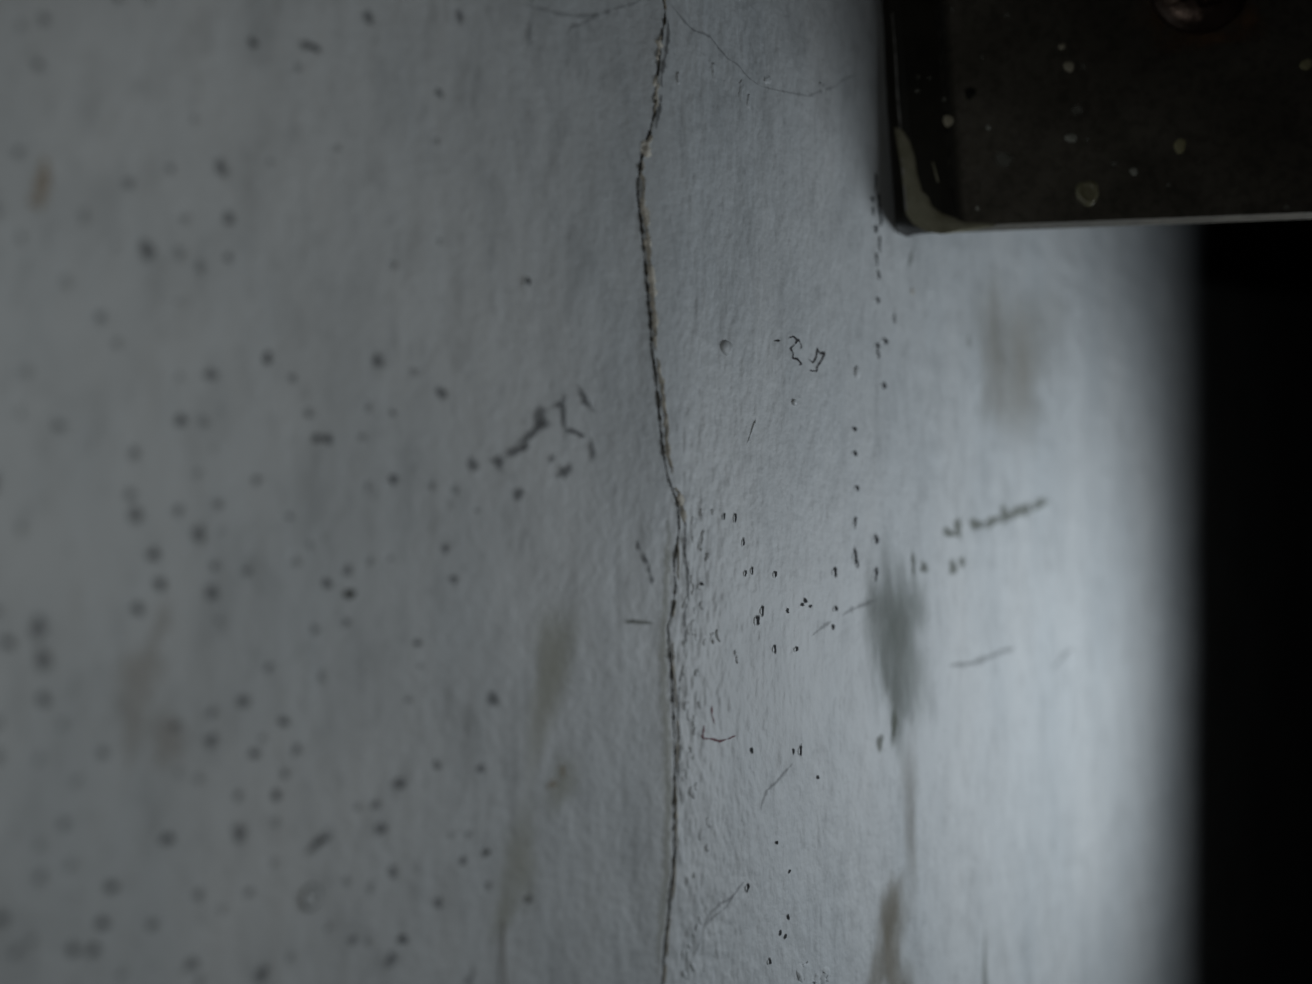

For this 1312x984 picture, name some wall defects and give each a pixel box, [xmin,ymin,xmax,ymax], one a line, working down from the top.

leakage [494,402,594,466]
crack [637,0,690,983]